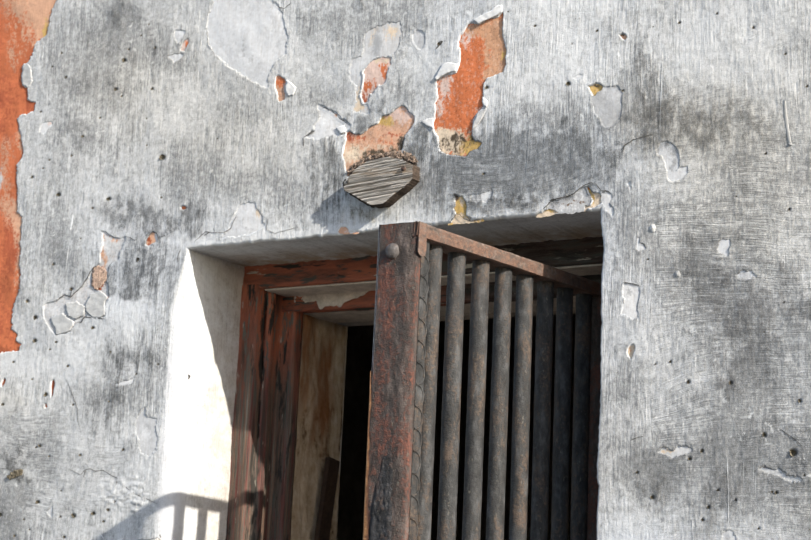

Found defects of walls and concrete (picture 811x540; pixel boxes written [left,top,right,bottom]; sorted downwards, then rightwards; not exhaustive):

peeling [206,0,296,101]
peeling [307,5,509,176]
peeling [0,0,57,353]
peeling [657,142,687,181]
peeling [448,190,493,225]
peeling [584,187,614,215]
peeling [658,446,703,460]
corrosion [368,438,393,540]
peeling [759,466,805,482]